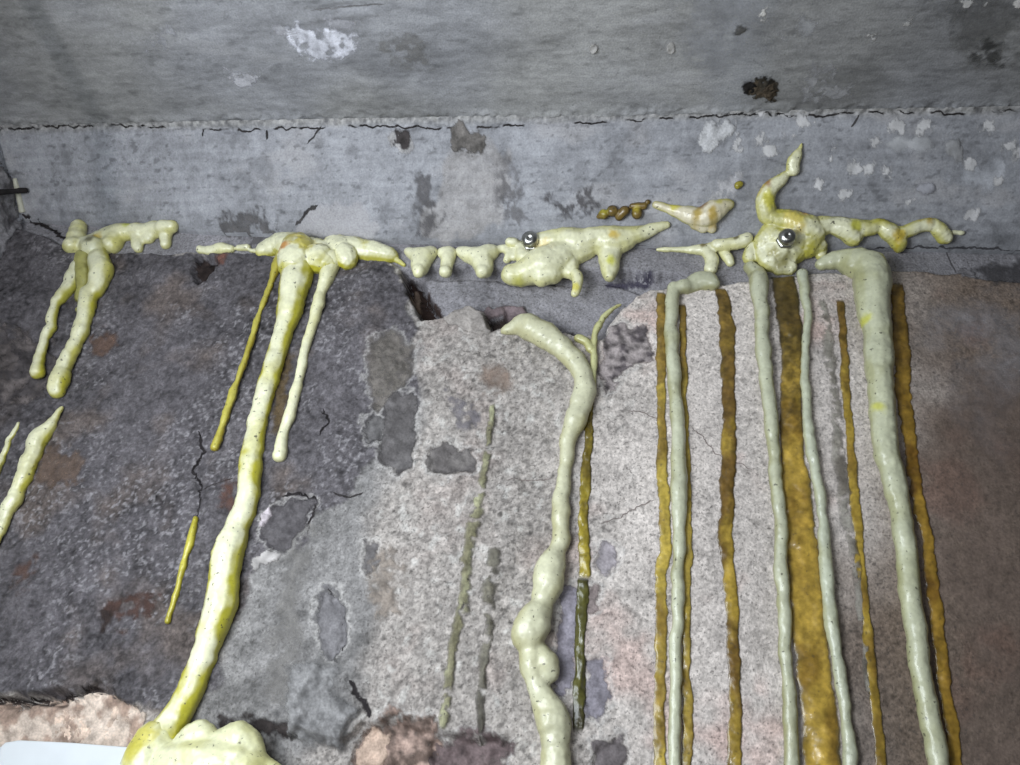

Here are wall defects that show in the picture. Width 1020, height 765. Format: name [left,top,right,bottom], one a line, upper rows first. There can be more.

efflorescence [274,20,357,62]
crack [8,123,166,131]
crack [202,124,451,144]
crack [477,122,524,130]
crack [630,110,964,127]